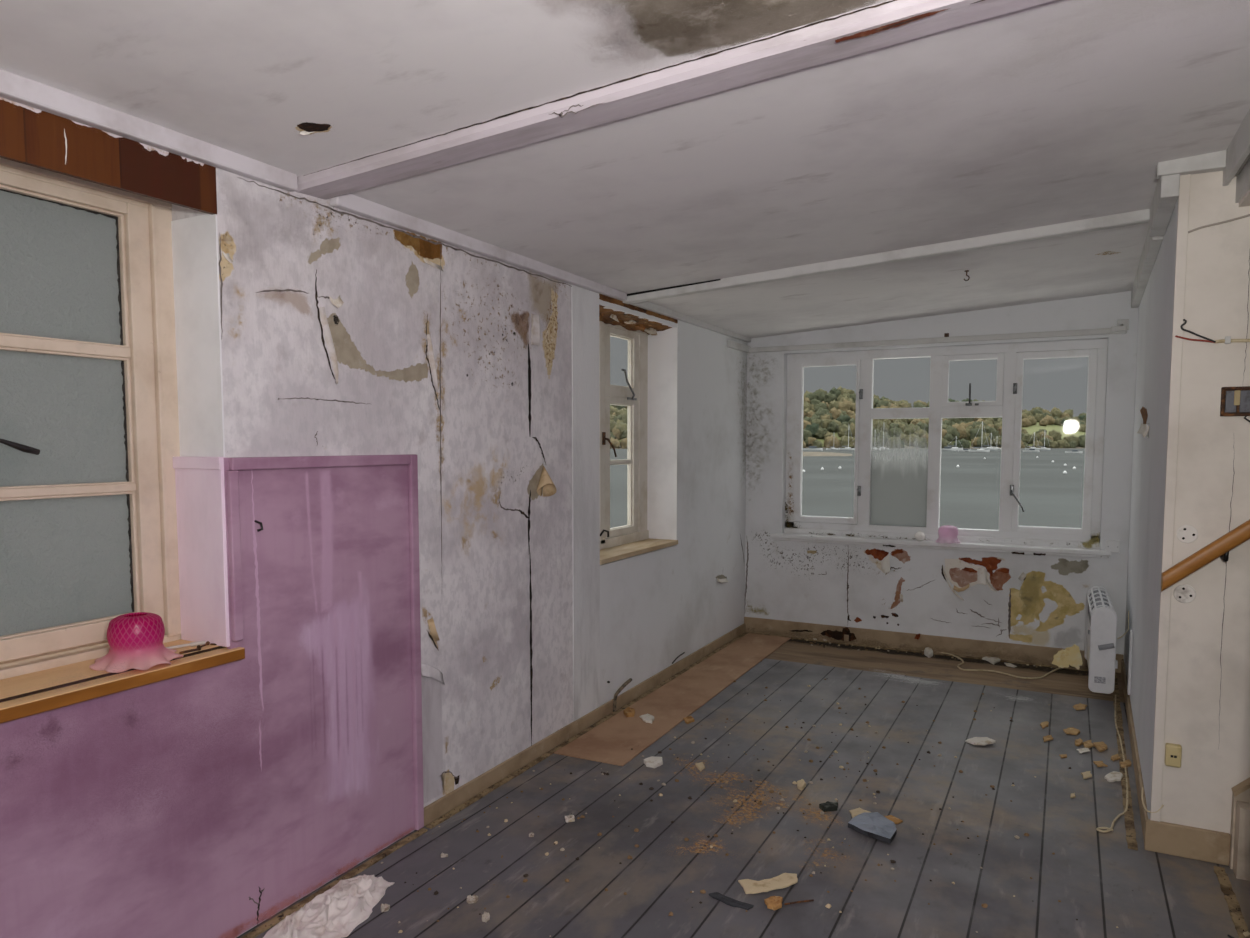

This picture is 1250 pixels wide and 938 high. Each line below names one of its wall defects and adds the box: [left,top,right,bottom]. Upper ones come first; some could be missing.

water stain [516,0,879,76]
peeling [0,97,42,113]
peeling [64,120,123,164]
peeling [139,142,204,166]
peeling [393,229,445,298]
peeling [315,269,428,384]
water stain [737,343,915,576]
crack [499,493,529,518]
spalling [854,545,911,626]
peeling [941,552,1102,647]